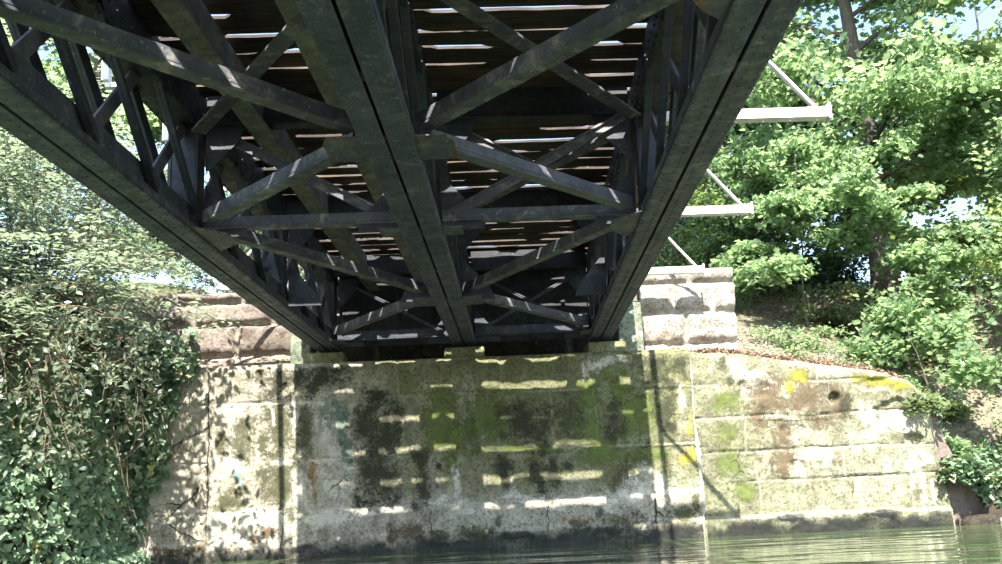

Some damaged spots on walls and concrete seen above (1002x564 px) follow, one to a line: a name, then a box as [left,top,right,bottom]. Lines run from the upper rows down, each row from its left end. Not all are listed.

crack [161,378,212,554]
leakage [150,379,954,564]